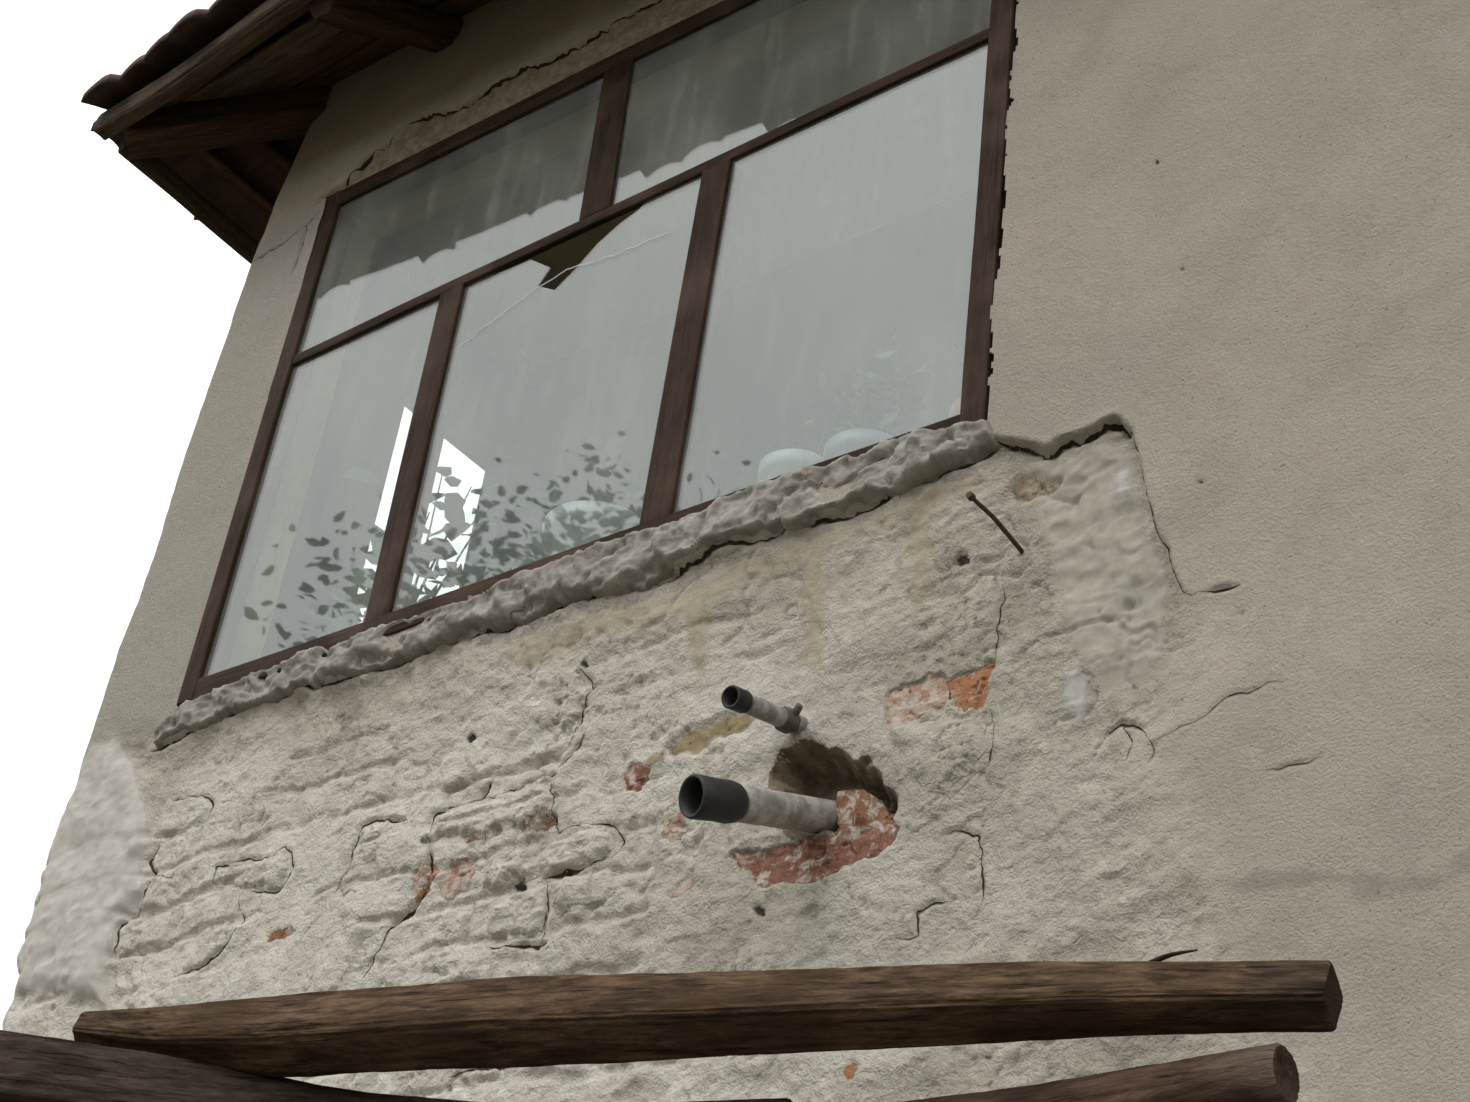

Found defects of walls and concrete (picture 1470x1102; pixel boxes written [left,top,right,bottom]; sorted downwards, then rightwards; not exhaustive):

crack [655,424,1241,596]
flaking render [1011,477,1061,501]
flaking render [885,662,995,730]
crack [1100,681,1284,760]
flaking render [624,763,651,792]
crack [1265,755,1323,770]
flaking render [523,806,558,832]
spalling [733,739,899,888]
flaking render [14,743,148,1000]
flaking render [411,828,501,903]
flaking render [267,926,296,942]
flaking render [844,1062,857,1080]